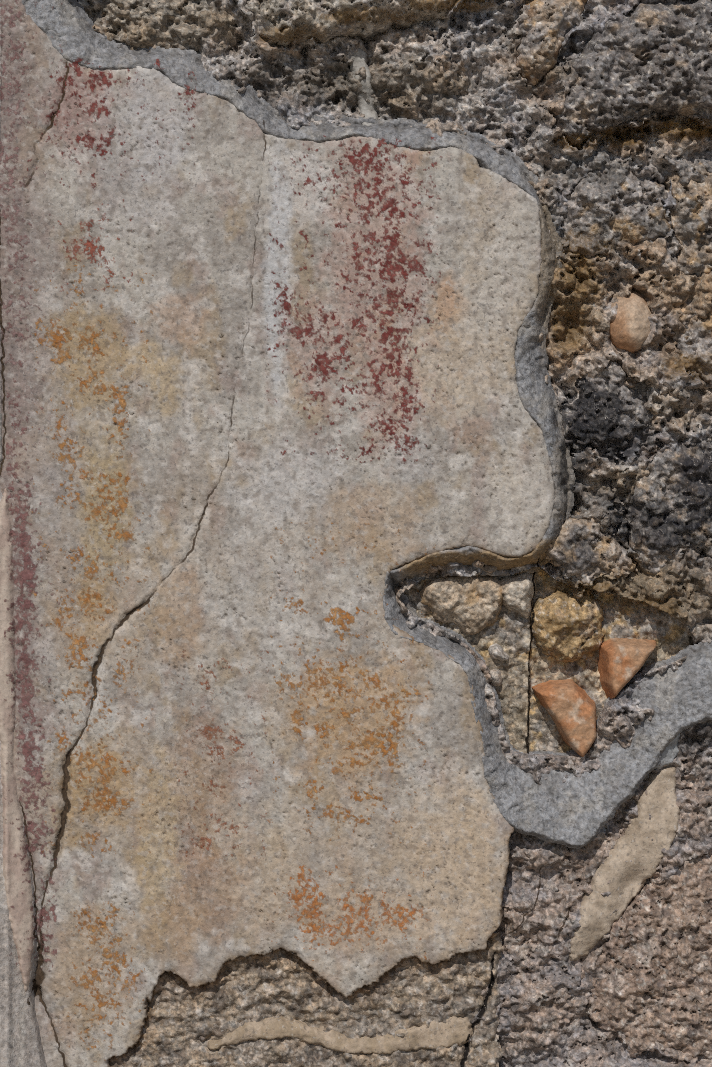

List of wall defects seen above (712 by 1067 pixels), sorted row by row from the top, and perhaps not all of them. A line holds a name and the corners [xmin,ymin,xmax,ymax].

crack [0,279,8,475]
peeling [0,0,154,458]
peeling [267,139,441,464]
water stain [552,379,645,496]
water stain [610,444,712,553]
peeling [4,380,152,972]
crack [19,457,229,1067]
peeling [175,813,247,857]
peeling [187,703,252,762]
peeling [272,602,428,832]
spalling [400,553,693,753]
spalling [67,865,504,1067]